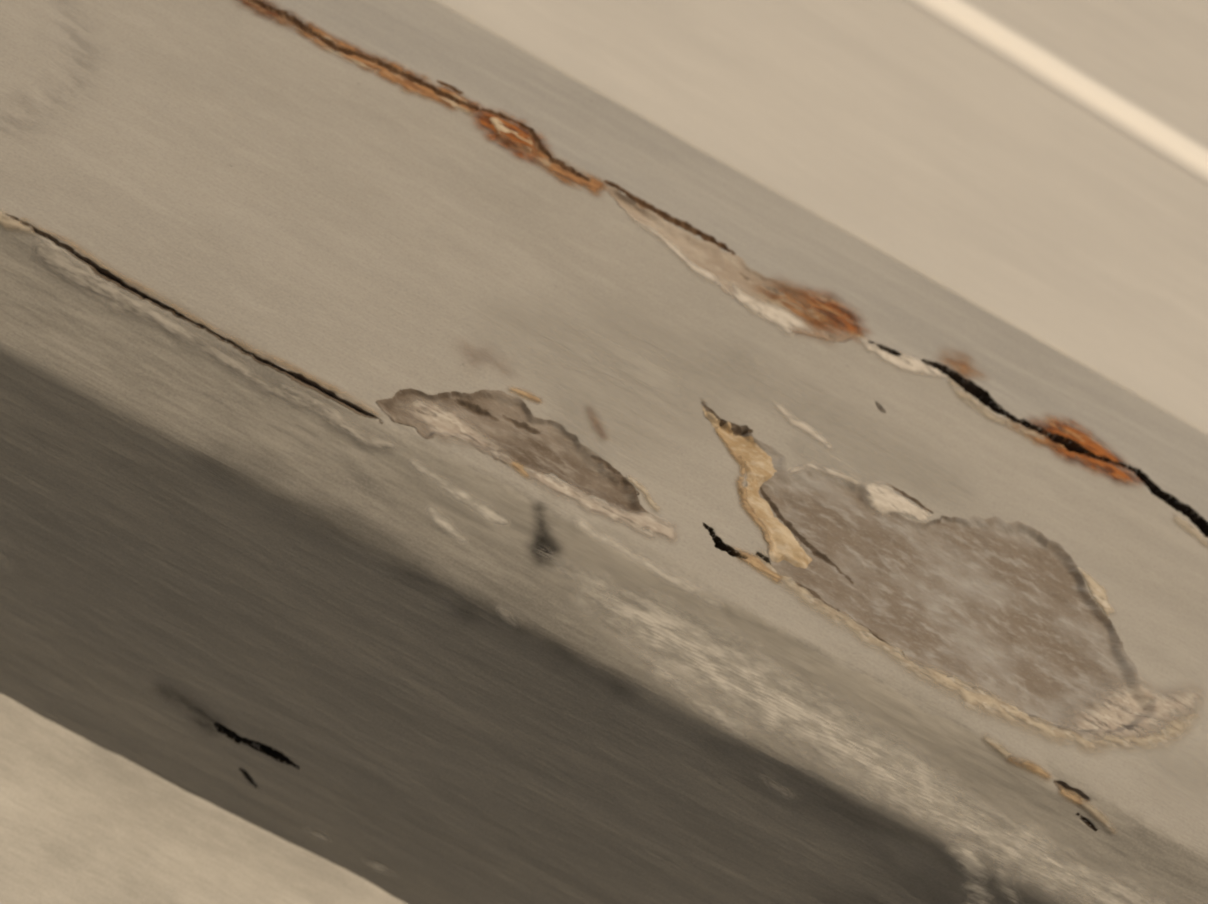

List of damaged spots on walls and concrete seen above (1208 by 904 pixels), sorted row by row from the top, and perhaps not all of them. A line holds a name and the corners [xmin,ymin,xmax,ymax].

corrosion [241,0,604,193]
crack [245,0,735,255]
crack [0,211,394,449]
corrosion [764,288,862,336]
spalling [589,178,1042,437]
spalling [376,388,676,540]
crack [703,523,783,582]
spalling [701,398,1200,749]
crack [868,341,1208,537]
corrosion [1010,418,1139,482]
crack [214,722,300,788]